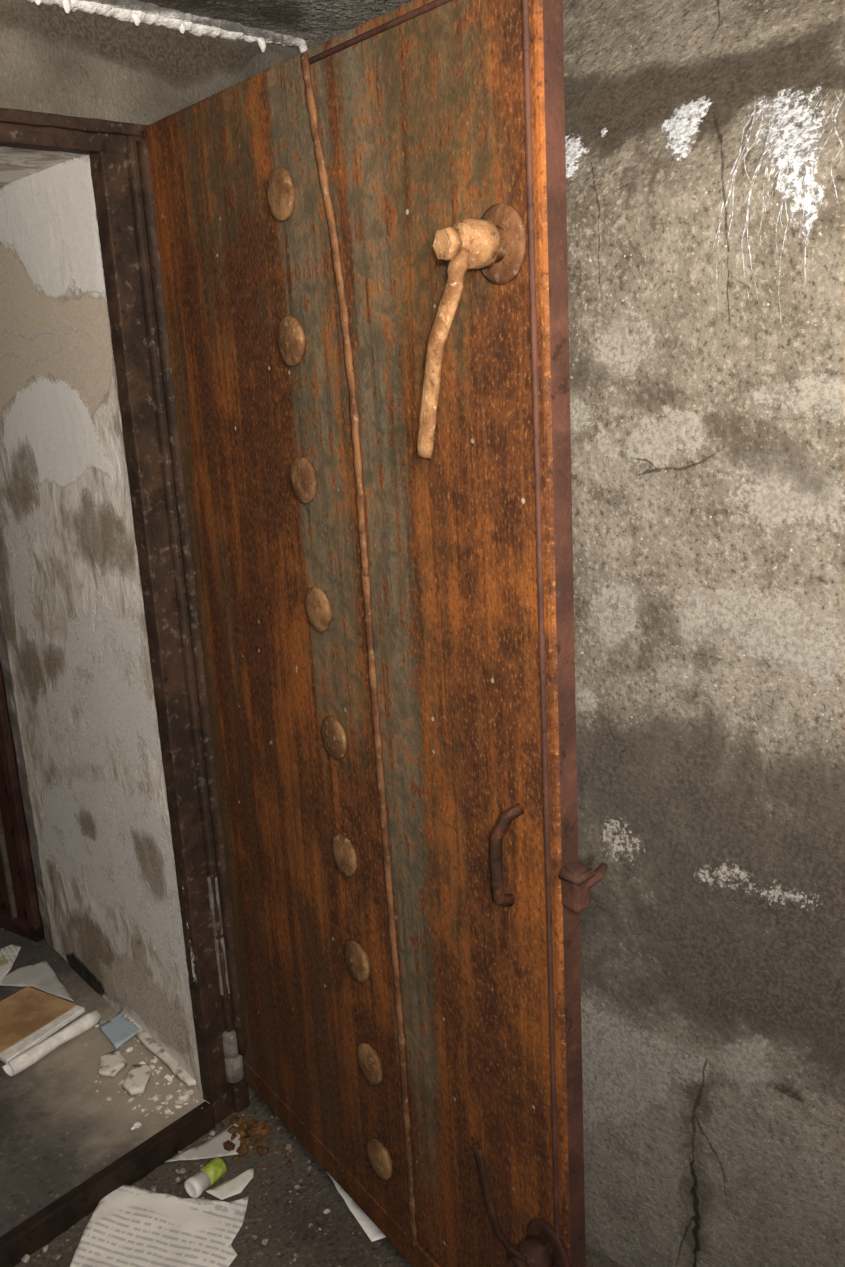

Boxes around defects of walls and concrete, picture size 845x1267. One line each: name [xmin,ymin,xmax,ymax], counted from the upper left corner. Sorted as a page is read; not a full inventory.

leakage [0,0,308,84]
leakage [564,22,845,316]
peeling [0,156,114,637]
leakage [576,710,845,1091]
crack [676,1058,729,1267]